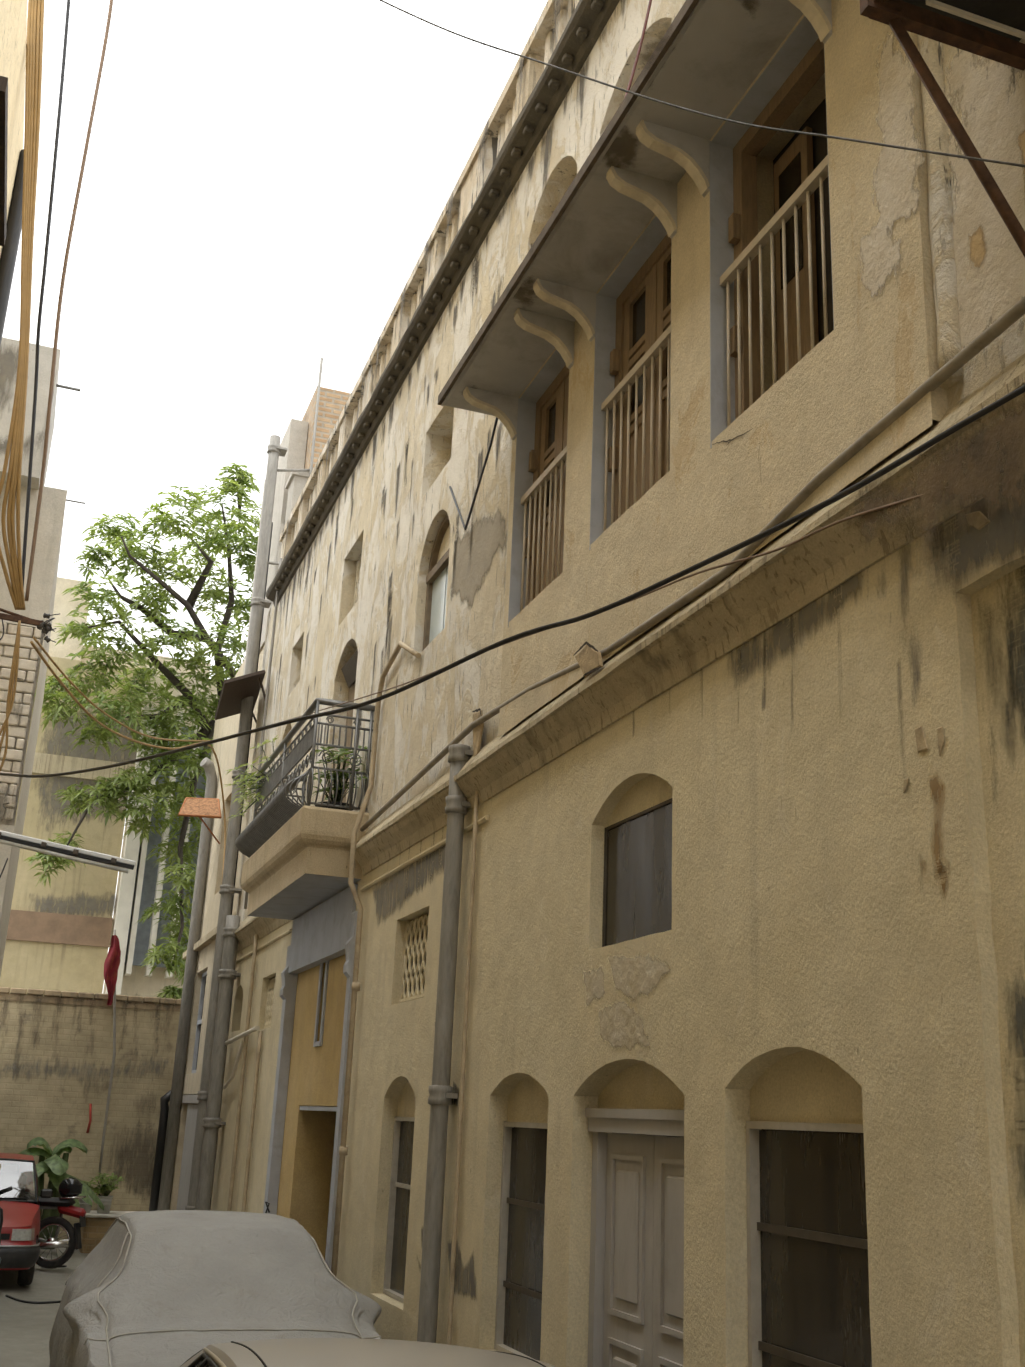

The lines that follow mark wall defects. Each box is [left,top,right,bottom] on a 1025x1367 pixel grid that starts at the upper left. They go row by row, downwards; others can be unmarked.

peeling [942,50,1025,350]
leakage [730,568,868,708]
leakage [374,833,445,921]
corrosion [921,777,947,896]
leakage [1011,984,1025,1060]